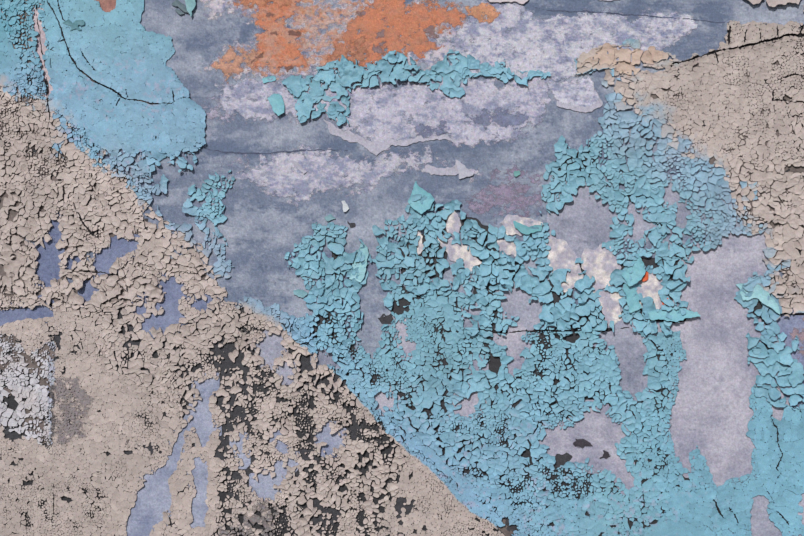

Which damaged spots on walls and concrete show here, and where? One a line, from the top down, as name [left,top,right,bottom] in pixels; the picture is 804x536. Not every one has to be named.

crack [34,0,191,134]
peeling [268,93,285,116]
rust [211,0,500,81]
peeling [324,120,459,156]
peeling [282,43,551,126]
peeling [557,98,603,113]
crack [534,7,804,67]
peeling [782,87,804,149]
peeling [425,164,459,176]
peeling [0,335,57,449]
peeling [746,303,804,421]
peeling [744,486,804,536]